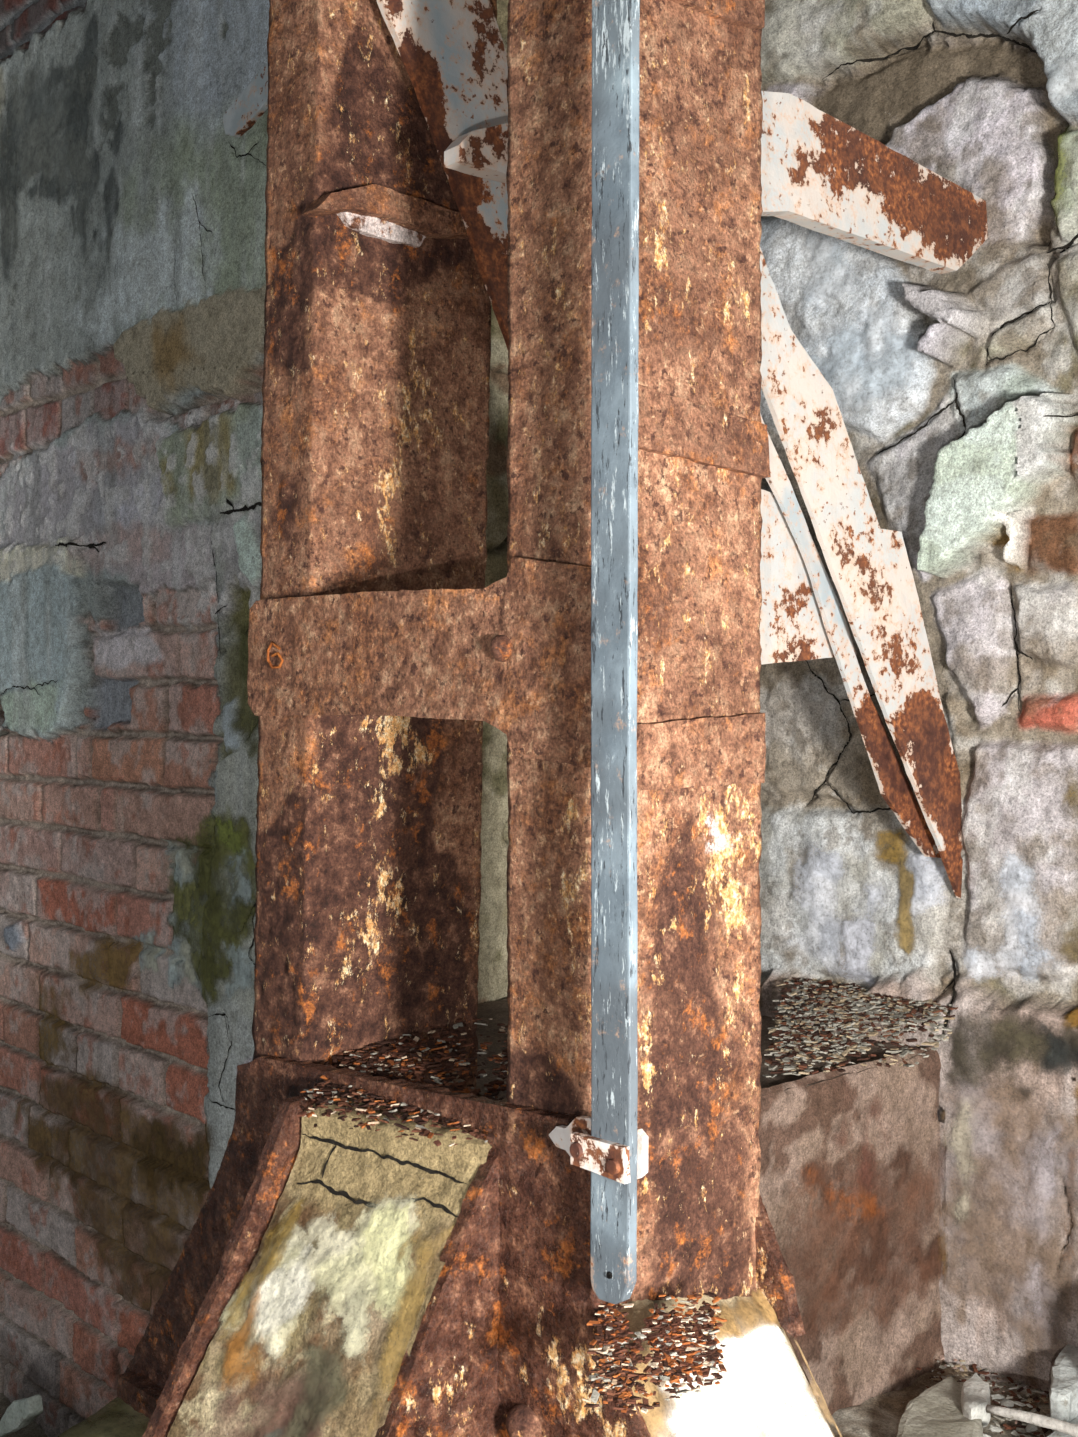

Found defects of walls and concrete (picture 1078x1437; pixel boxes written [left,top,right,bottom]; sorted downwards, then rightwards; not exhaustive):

flaking render [0,0,87,61]
crack [822,10,1040,80]
water stain [0,15,123,275]
flaking render [0,285,266,475]
crack [211,498,262,655]
flaking render [0,582,224,1437]
water stain [69,932,198,991]
water stain [16,989,211,1311]
crack [297,1134,466,1217]
corrosion [224,1295,324,1437]
corrosion [381,1234,436,1390]
corrosion [795,1341,842,1437]